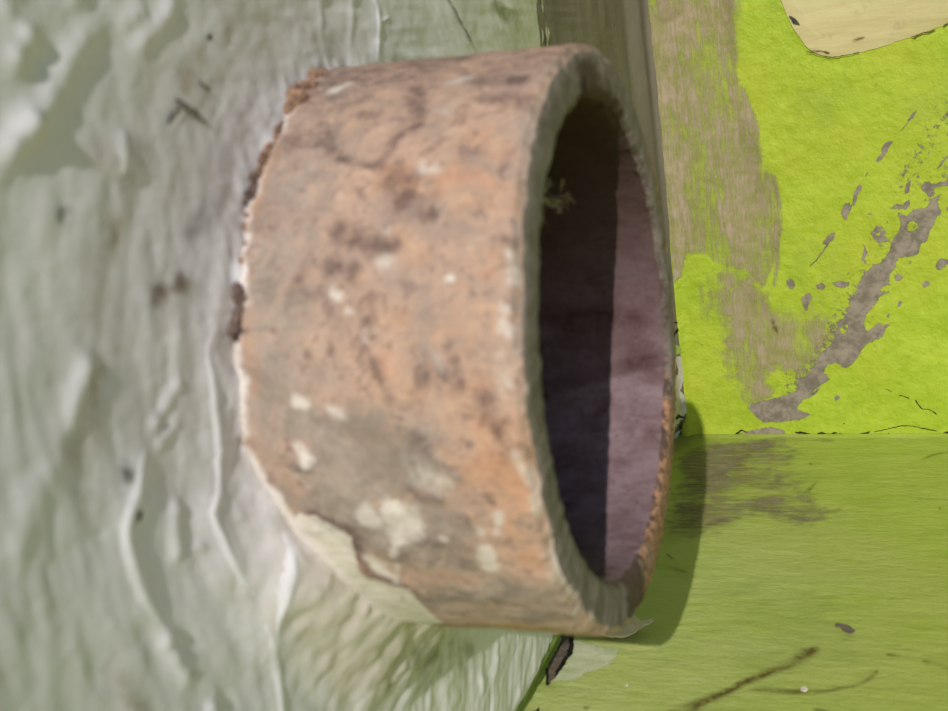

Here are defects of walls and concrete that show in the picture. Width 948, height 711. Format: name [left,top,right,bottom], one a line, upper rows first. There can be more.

peeling [739,102,948,434]
peeling [674,322,687,432]
peeling [551,640,621,682]